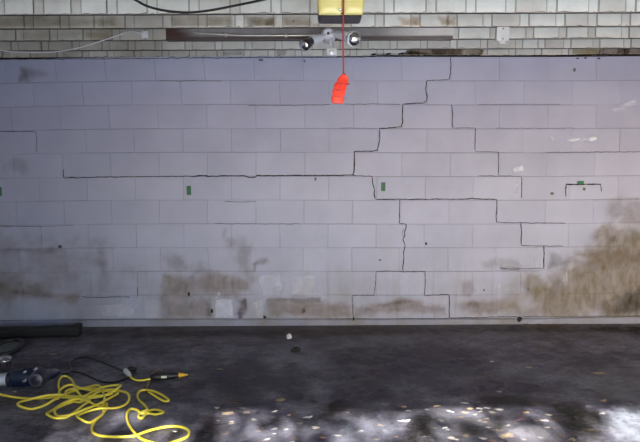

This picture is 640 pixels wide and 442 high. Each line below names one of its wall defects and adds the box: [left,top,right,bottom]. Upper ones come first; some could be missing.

crack [63,57,631,319]
leakage [535,236,640,317]